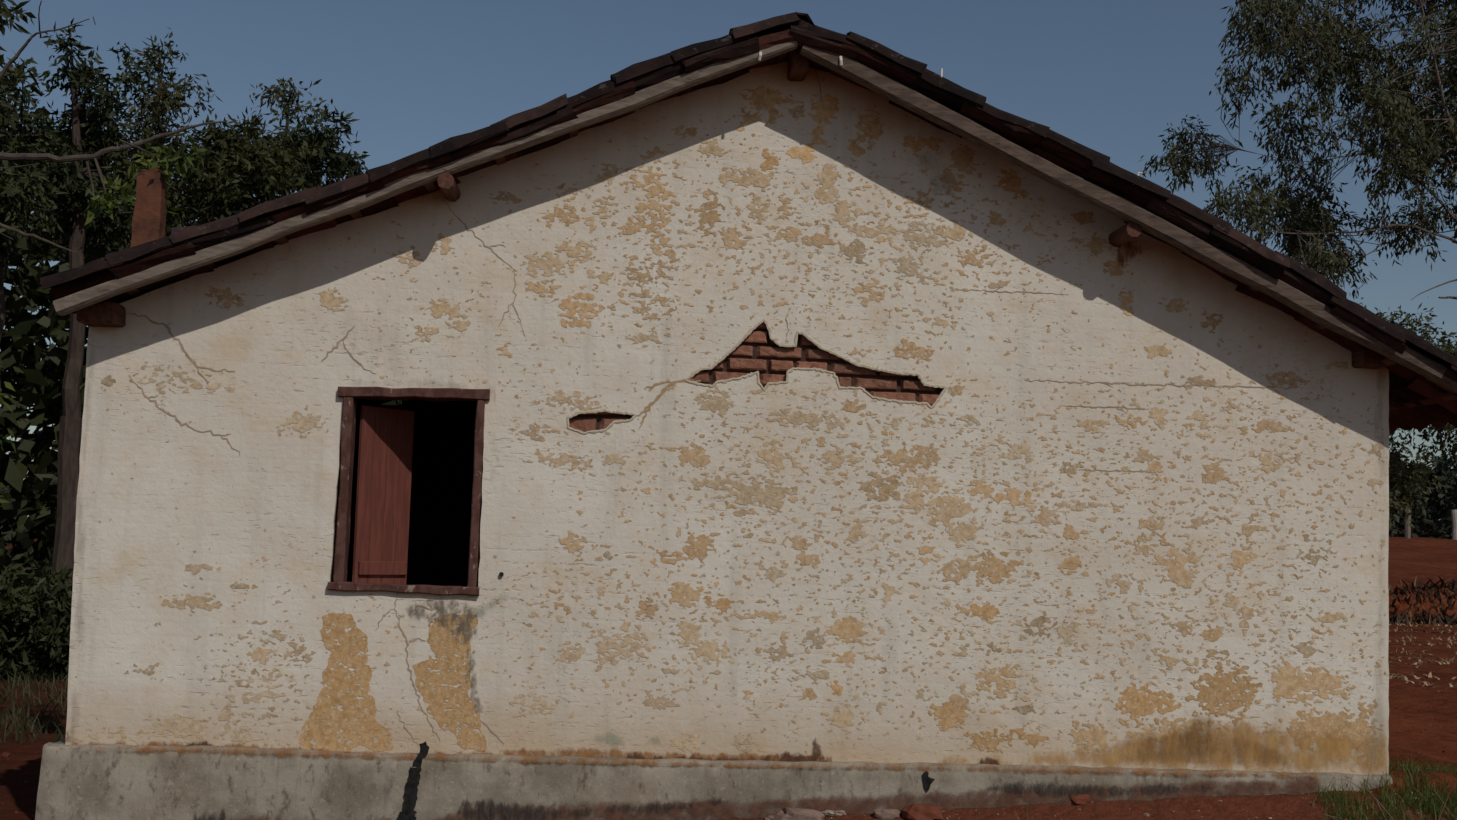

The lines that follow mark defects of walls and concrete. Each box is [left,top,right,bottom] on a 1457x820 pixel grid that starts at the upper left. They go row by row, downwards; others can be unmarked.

crack [443,199,525,336]
crack [126,313,235,384]
crack [129,375,240,455]
crack [636,379,701,429]
peeling [70,69,1386,772]
spalling [922,771,935,792]
damp [989,782,1179,795]
damp [1036,722,1385,771]